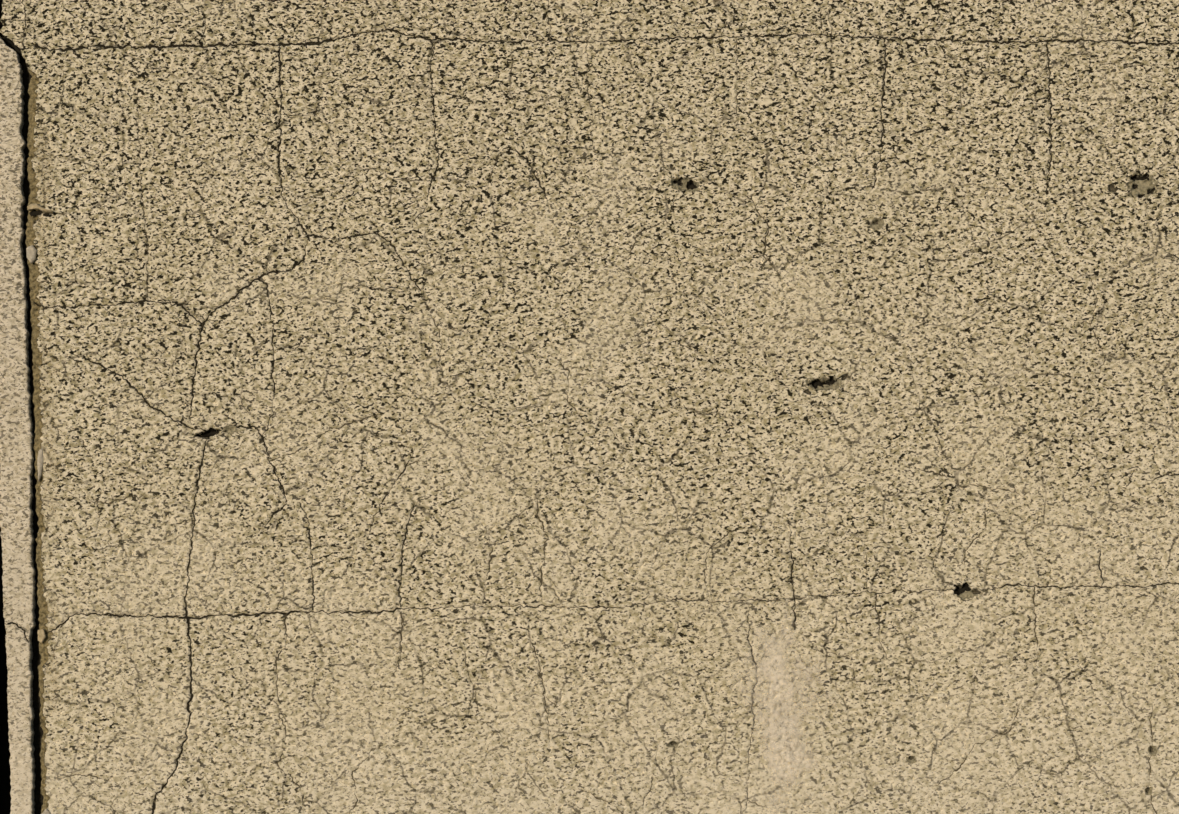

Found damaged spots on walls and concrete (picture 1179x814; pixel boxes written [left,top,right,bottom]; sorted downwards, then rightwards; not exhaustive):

crack [27,0,1179,432]
crack [1,0,44,814]
crack [550,354,626,450]
crack [215,410,387,529]
crack [915,467,1021,496]
crack [45,440,952,814]
crack [961,509,1179,667]
crack [932,701,1022,787]
crack [1148,706,1157,814]